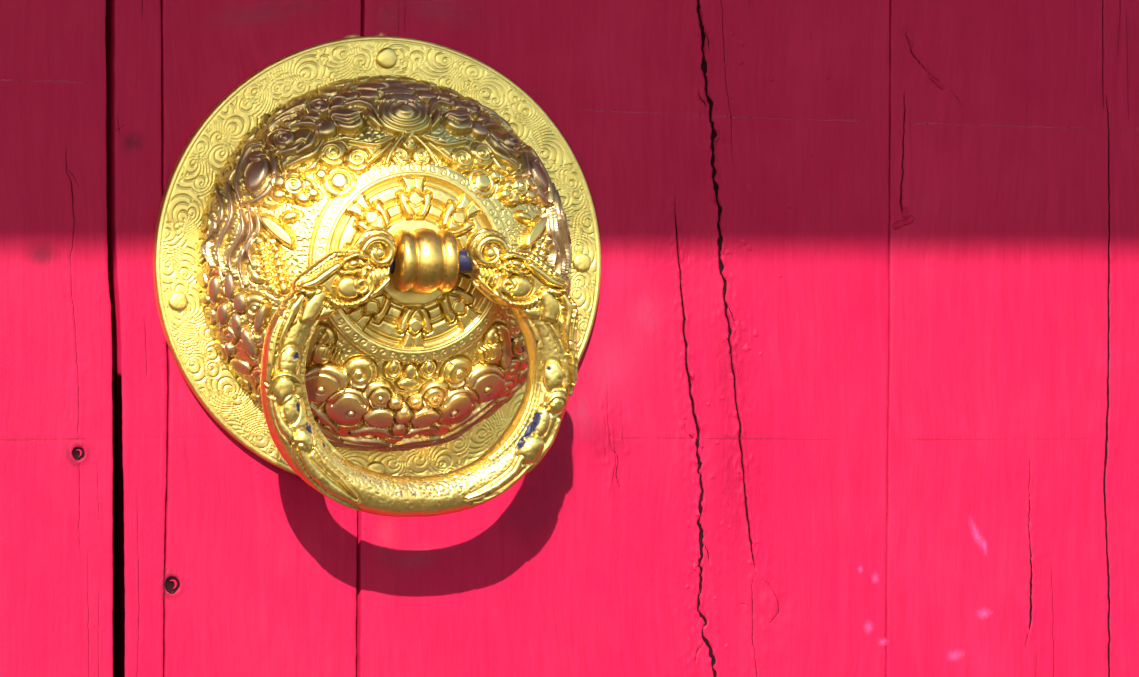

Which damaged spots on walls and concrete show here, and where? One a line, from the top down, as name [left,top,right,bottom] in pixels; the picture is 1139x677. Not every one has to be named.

crack [674,202,717,677]
crack [697,0,779,673]
crack [1025,481,1054,677]